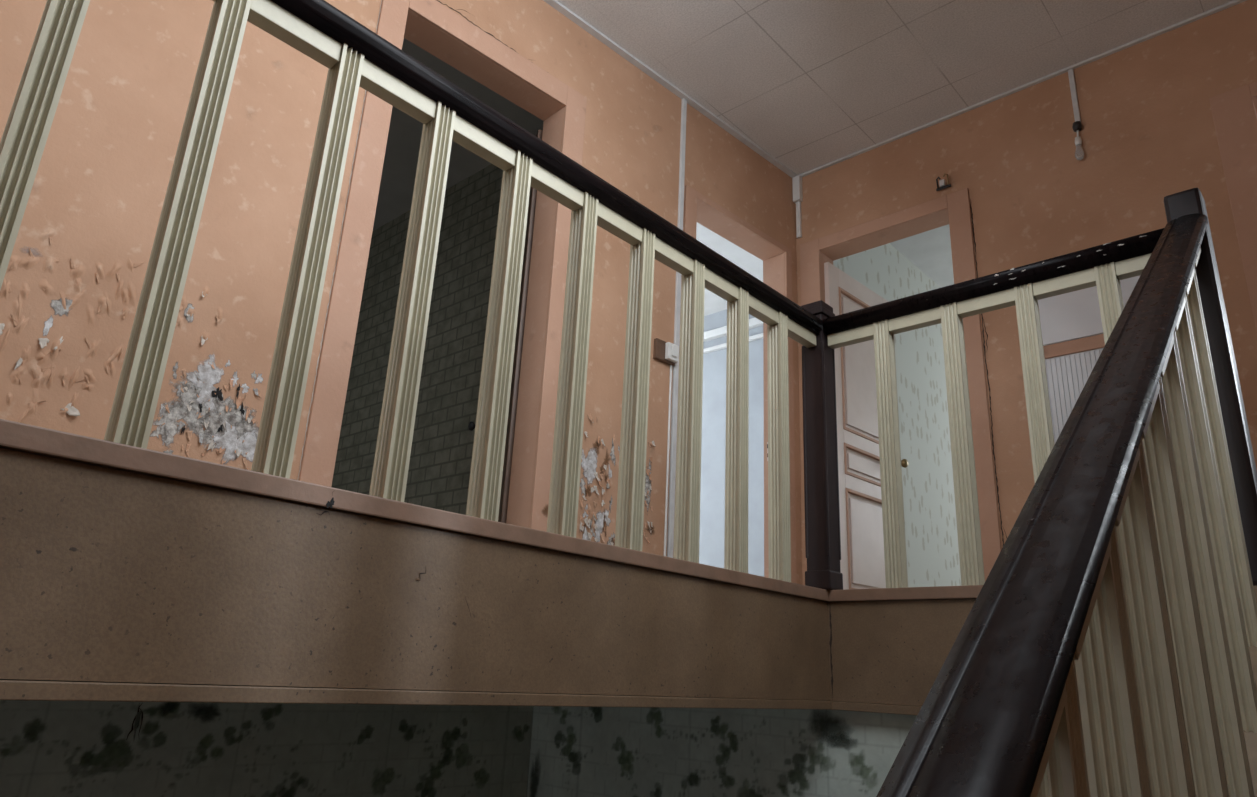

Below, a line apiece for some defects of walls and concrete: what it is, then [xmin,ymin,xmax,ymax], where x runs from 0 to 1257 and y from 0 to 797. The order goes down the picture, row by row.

peeling [38,316,64,351]
peeling [61,403,80,416]
flaking render [150,335,263,470]
peeling [579,465,614,545]
water stain [812,713,851,748]